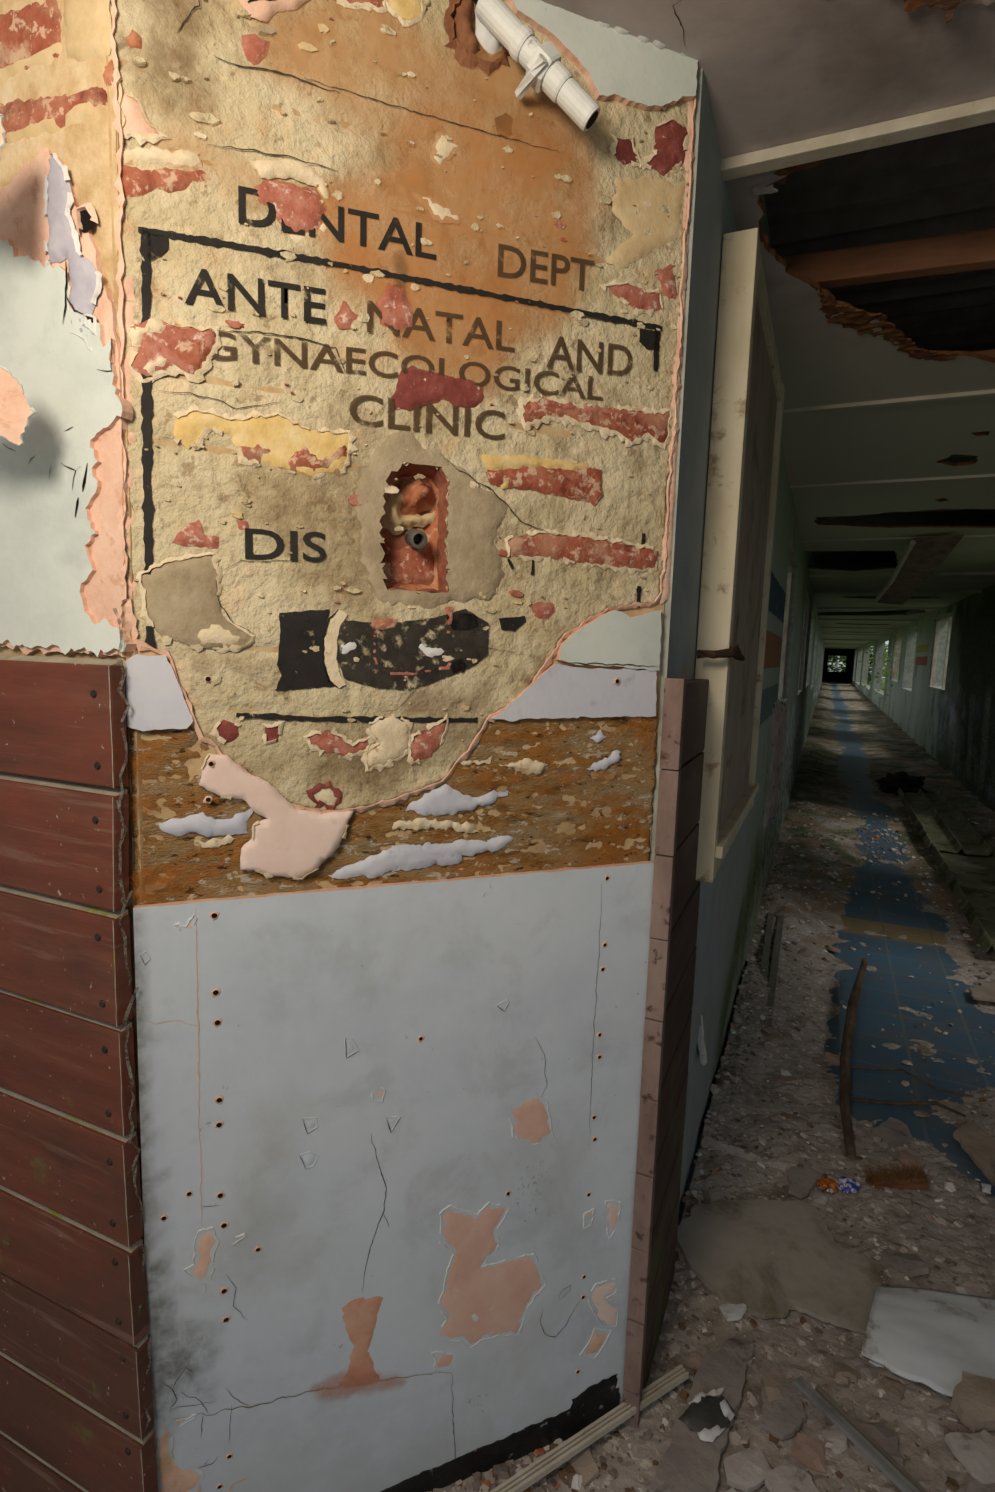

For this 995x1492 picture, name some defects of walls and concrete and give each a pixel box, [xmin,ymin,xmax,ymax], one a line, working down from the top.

spalling [0,0,696,880]
peeling [509,1093,554,1145]
peeling [184,1222,262,1295]
crack [362,1135,389,1290]
peeling [432,1190,547,1373]
peeling [325,1296,395,1395]
peeling [570,1274,618,1432]
peeling [156,1414,247,1492]
crack [163,1367,340,1468]
crack [376,1372,456,1459]